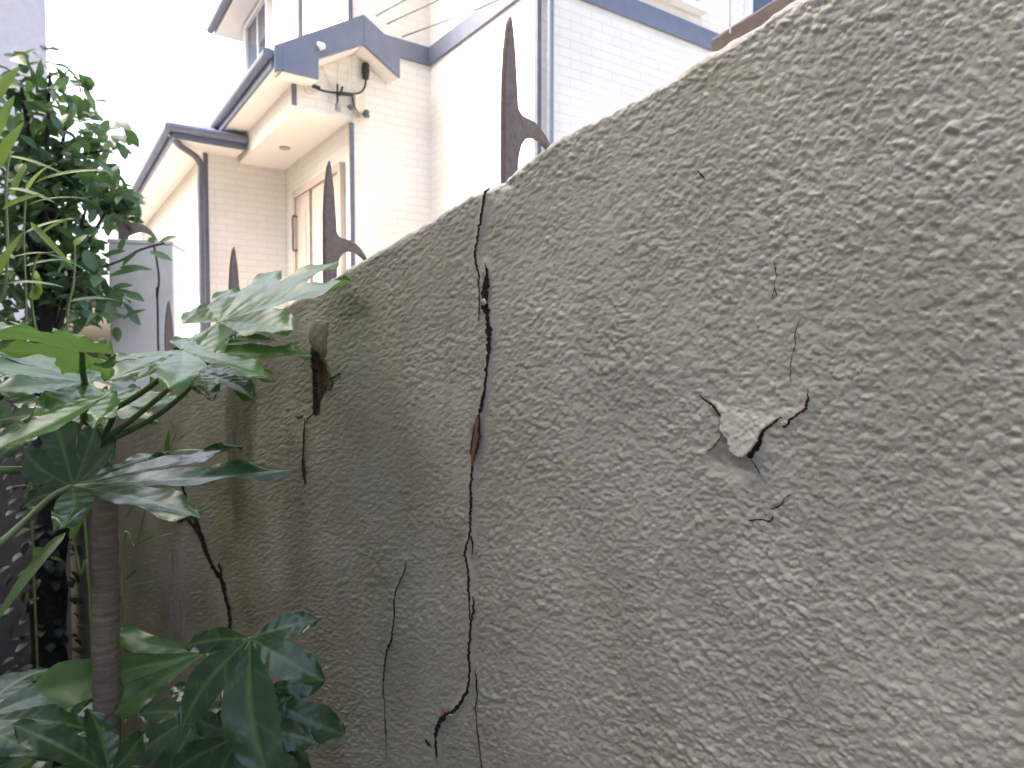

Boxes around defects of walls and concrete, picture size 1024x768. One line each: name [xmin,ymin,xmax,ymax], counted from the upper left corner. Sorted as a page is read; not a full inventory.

crack [301,414,313,485]
spalling [295,347,341,419]
crack [425,188,493,768]
peeling [700,390,810,474]
crack [177,486,232,629]
crack [382,561,407,755]